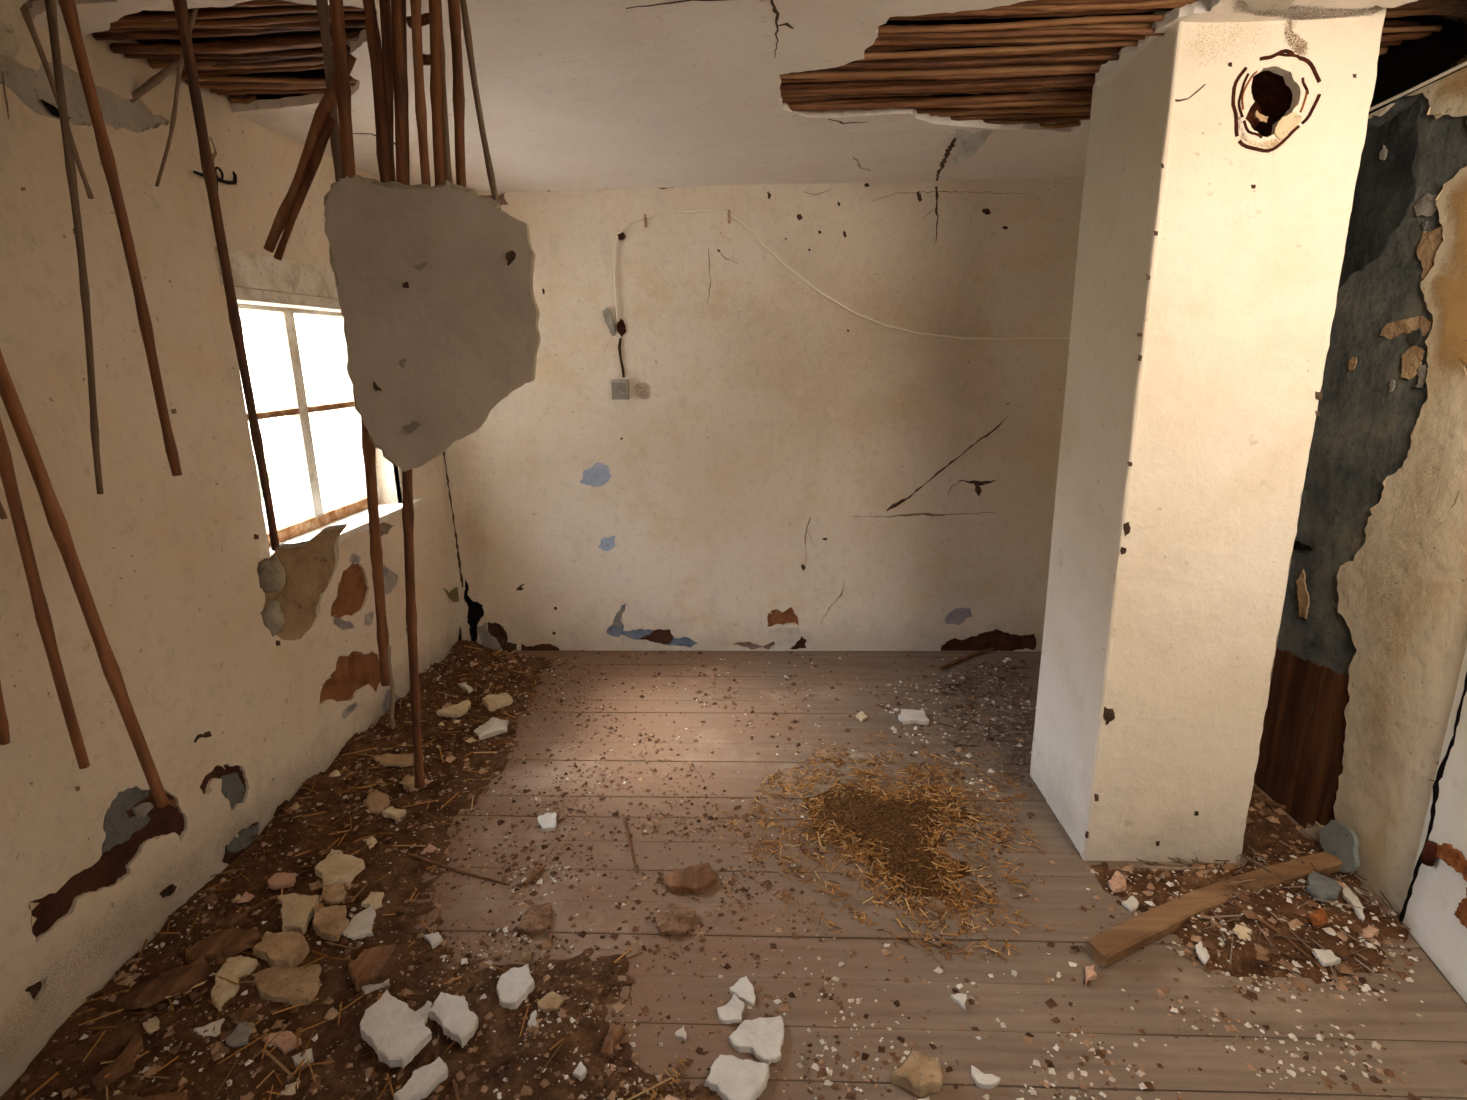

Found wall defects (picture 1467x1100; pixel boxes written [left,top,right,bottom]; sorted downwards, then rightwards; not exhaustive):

crack [626,0,725,9]
crack [770,0,794,56]
peeling [0,59,167,132]
peeling [1277,93,1467,675]
crack [853,403,1010,517]
spalling [331,562,368,618]
peeling [606,603,807,651]
spalling [941,608,1037,652]
spalling [319,651,381,704]
spalling [200,764,246,809]
spalling [29,786,185,938]